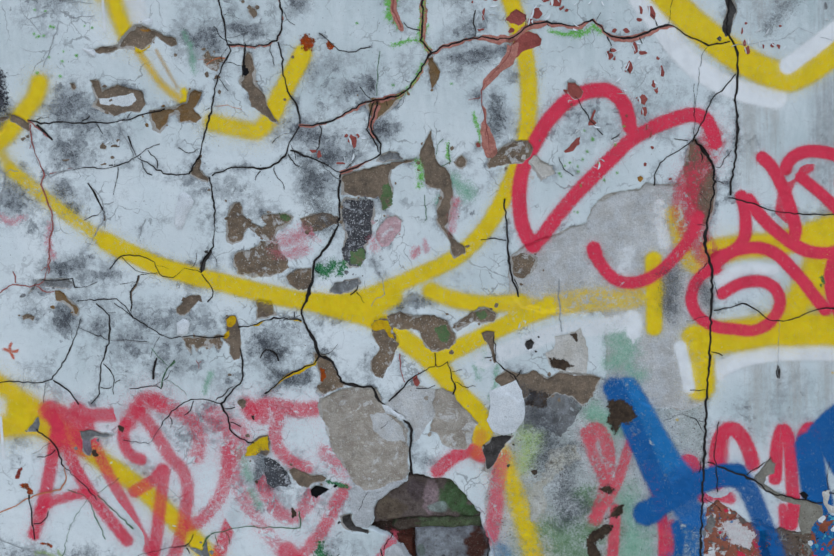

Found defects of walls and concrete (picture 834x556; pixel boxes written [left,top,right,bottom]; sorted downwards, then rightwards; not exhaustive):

spalling [82,18,177,57]
flaking render [505,0,577,58]
spalling [90,79,202,133]
crack [0,108,165,293]
crack [0,272,225,405]
crack [142,348,254,444]
spalling [224,131,470,294]
crack [65,0,730,405]
spalling [312,138,834,556]
crack [653,0,834,556]
crack [0,429,133,556]
spalling [245,434,337,498]